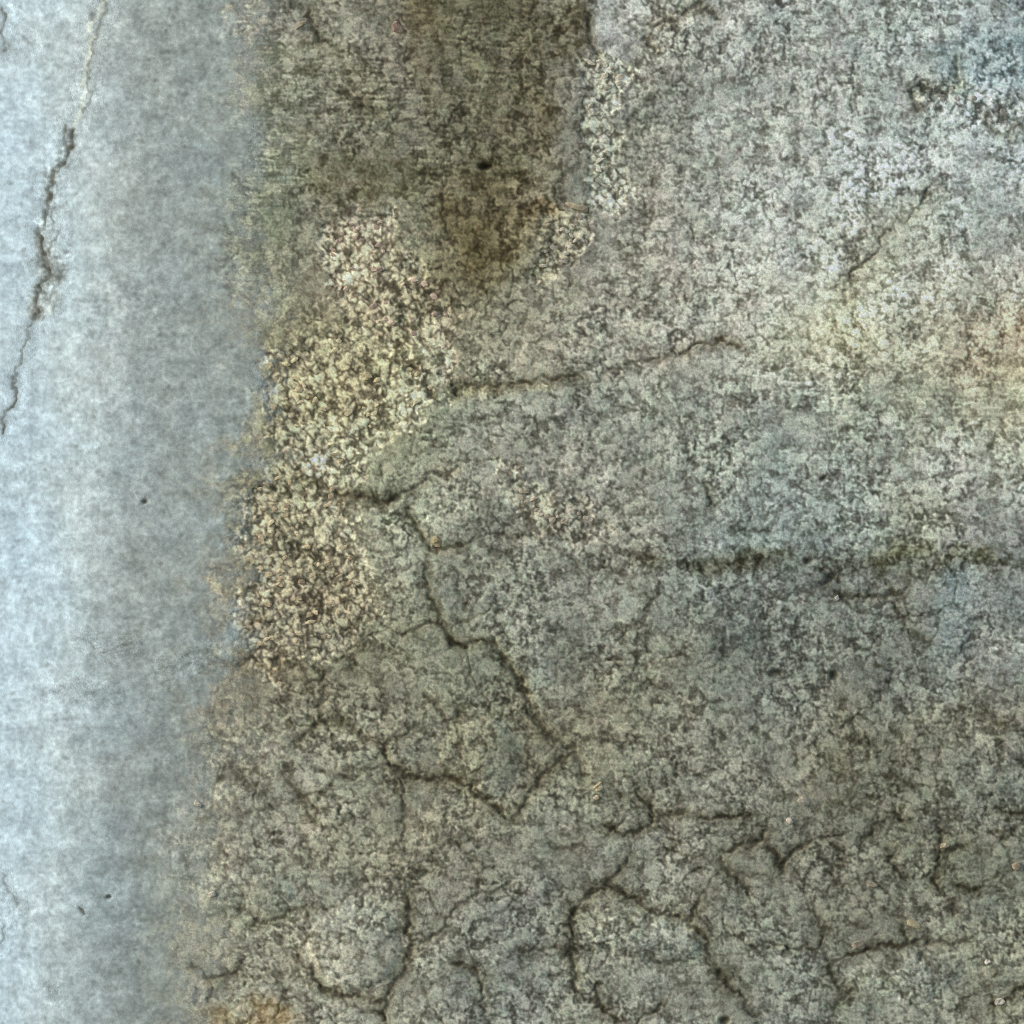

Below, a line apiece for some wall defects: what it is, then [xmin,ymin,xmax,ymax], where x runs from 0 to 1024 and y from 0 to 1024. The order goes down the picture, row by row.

crack [0,0,120,445]
crack [437,324,755,413]
crack [41,452,1024,1024]